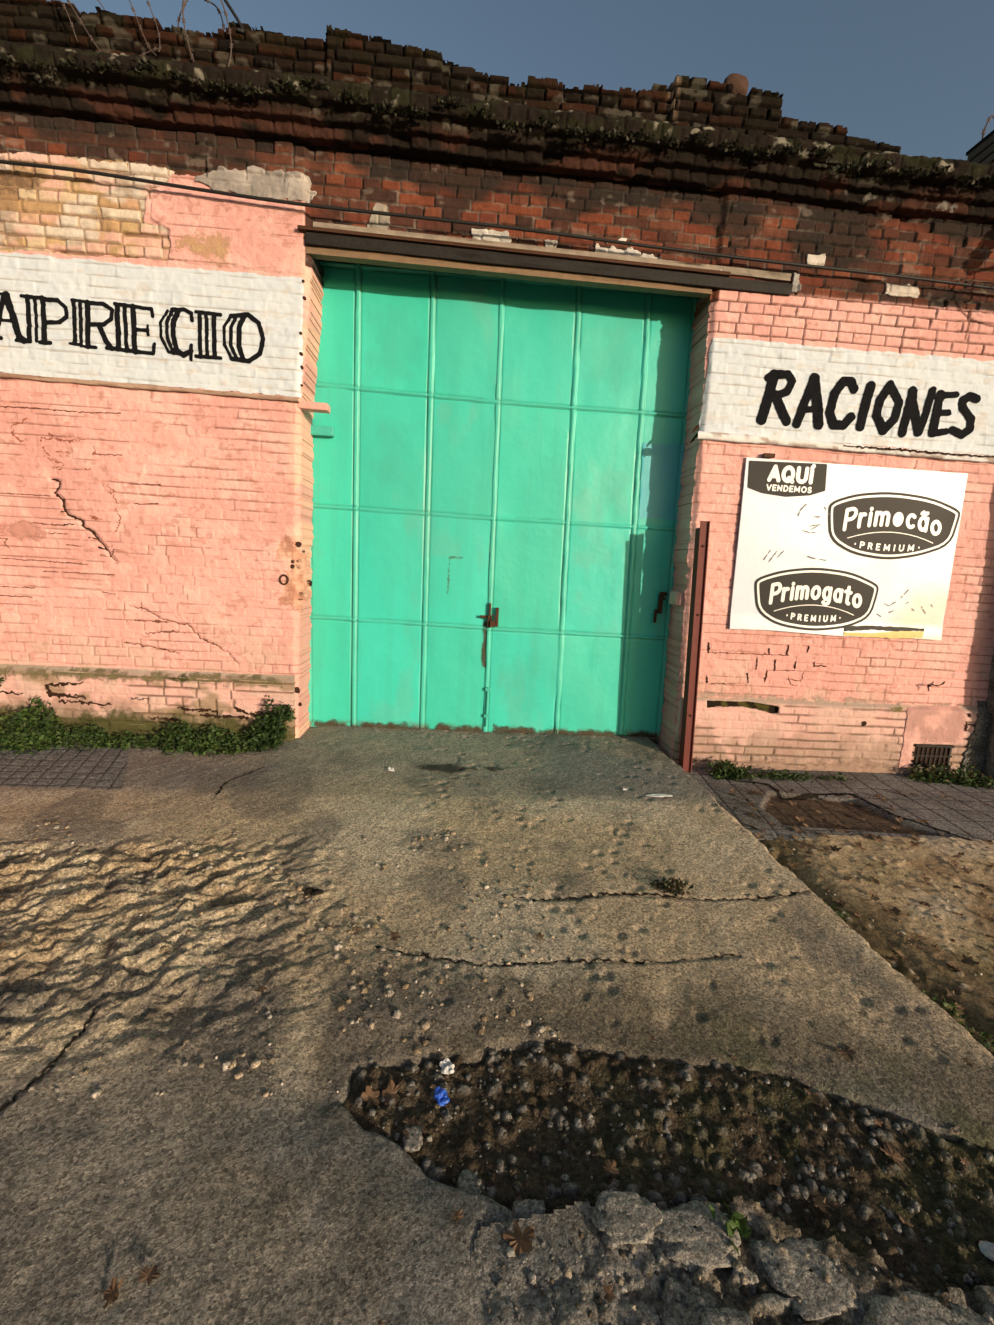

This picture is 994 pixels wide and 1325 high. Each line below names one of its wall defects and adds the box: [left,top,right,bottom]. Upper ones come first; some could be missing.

flaking render [0,152,175,261]
crack [0,406,121,414]
crack [96,453,161,505]
crack [0,479,239,664]
peeling [277,536,311,613]
crack [0,681,267,722]
crack [0,1004,101,1111]